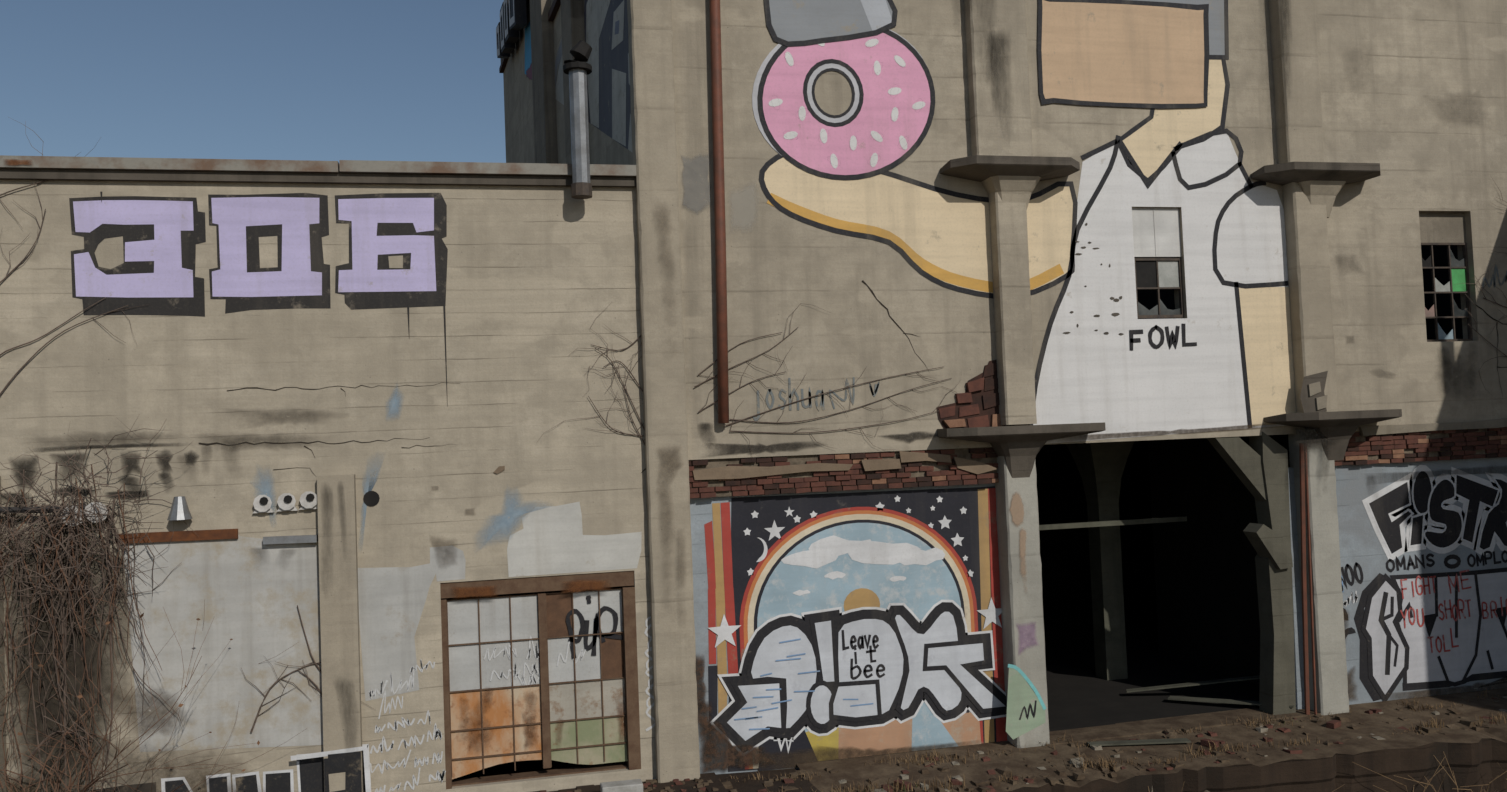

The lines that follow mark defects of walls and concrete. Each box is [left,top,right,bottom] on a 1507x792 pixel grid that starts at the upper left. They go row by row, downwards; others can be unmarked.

spalling [937,360,1005,429]
water stain [59,463,147,499]